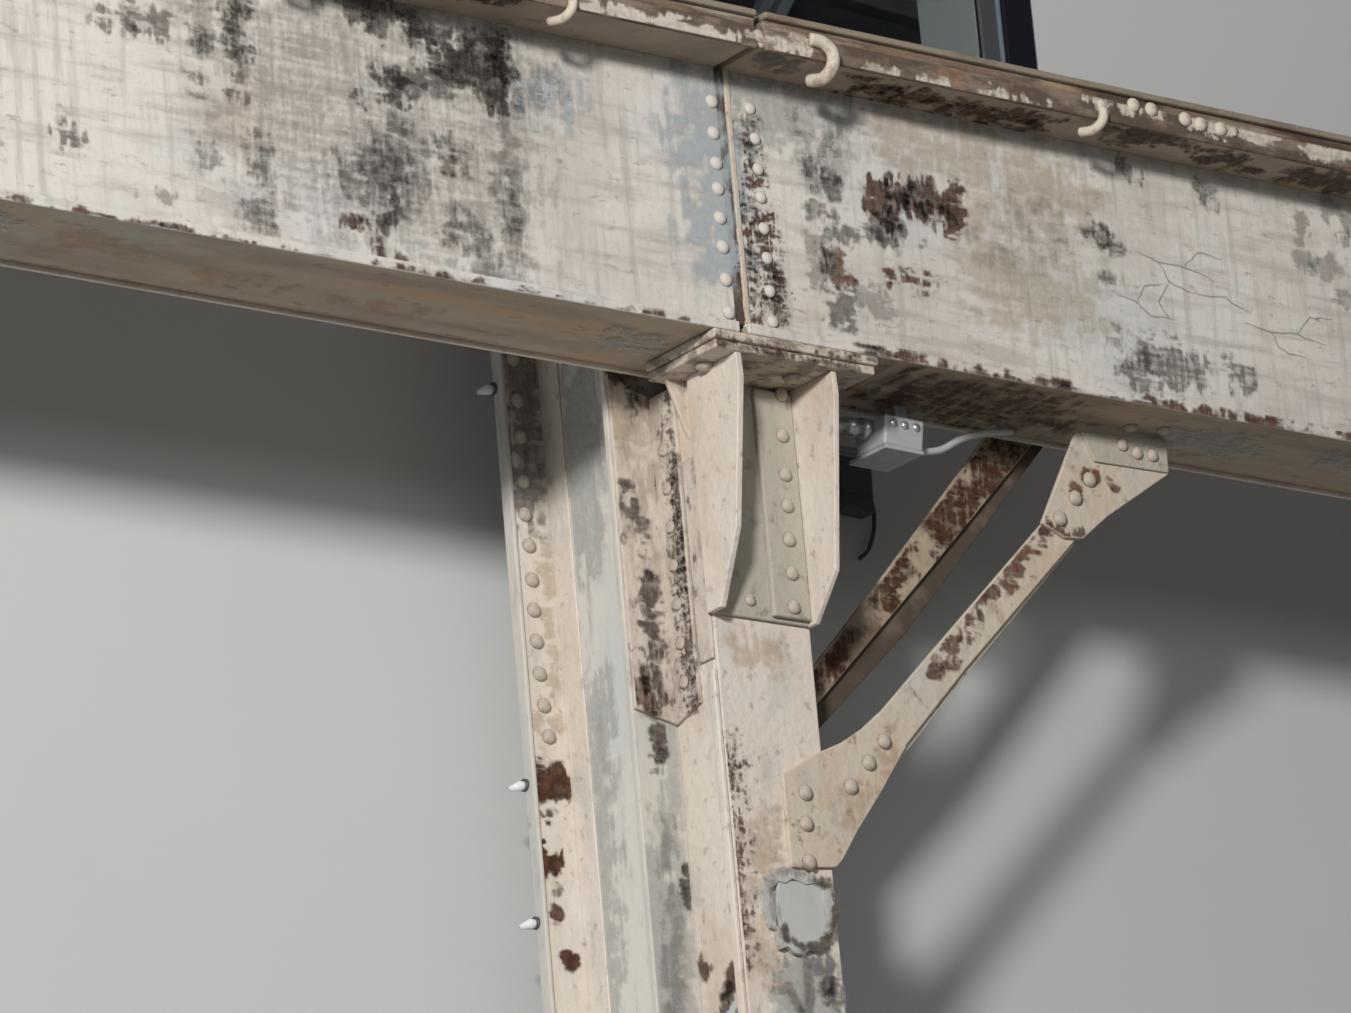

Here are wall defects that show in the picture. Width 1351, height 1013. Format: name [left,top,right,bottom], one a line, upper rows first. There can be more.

leakage [242,184,277,229]
leakage [371,109,436,224]
leakage [498,102,526,261]
rust [735,118,792,326]
peeling [1082,95,1163,121]
peeling [1188,118,1281,146]
peeling [1298,144,1351,163]
crack [1116,251,1325,358]
rust [926,520,1085,679]
rust [535,757,571,922]
peeling [697,728,845,1013]
rust [560,949,581,972]